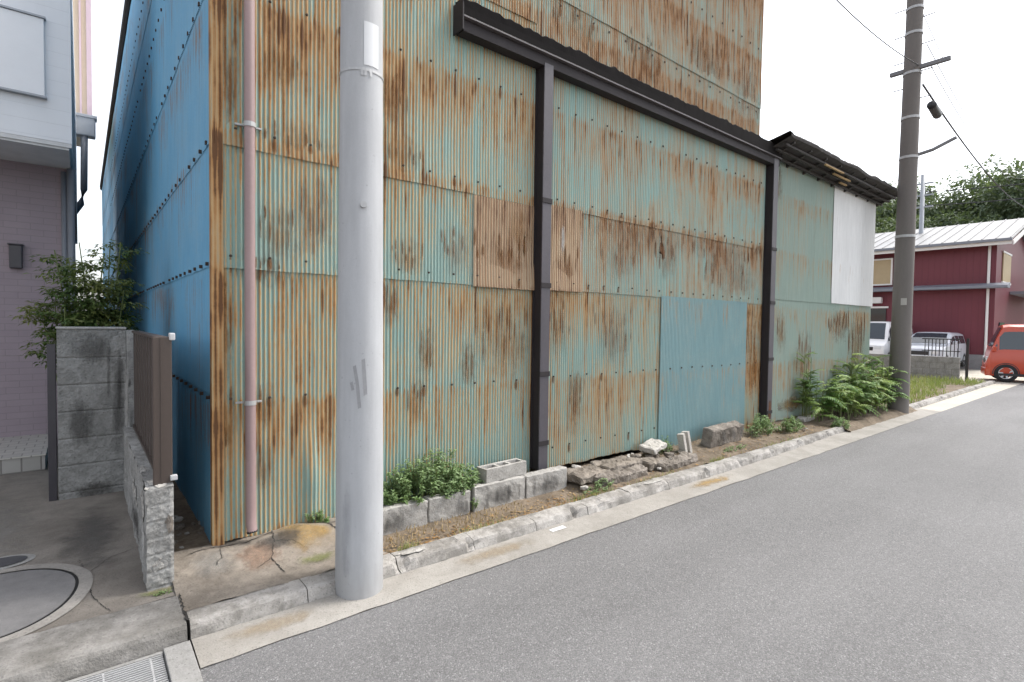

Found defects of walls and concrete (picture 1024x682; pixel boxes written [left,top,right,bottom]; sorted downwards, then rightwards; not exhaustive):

corrosion [219,8,236,126]
corrosion [466,308,532,373]
corrosion [828,313,865,352]
crack [188,531,303,572]